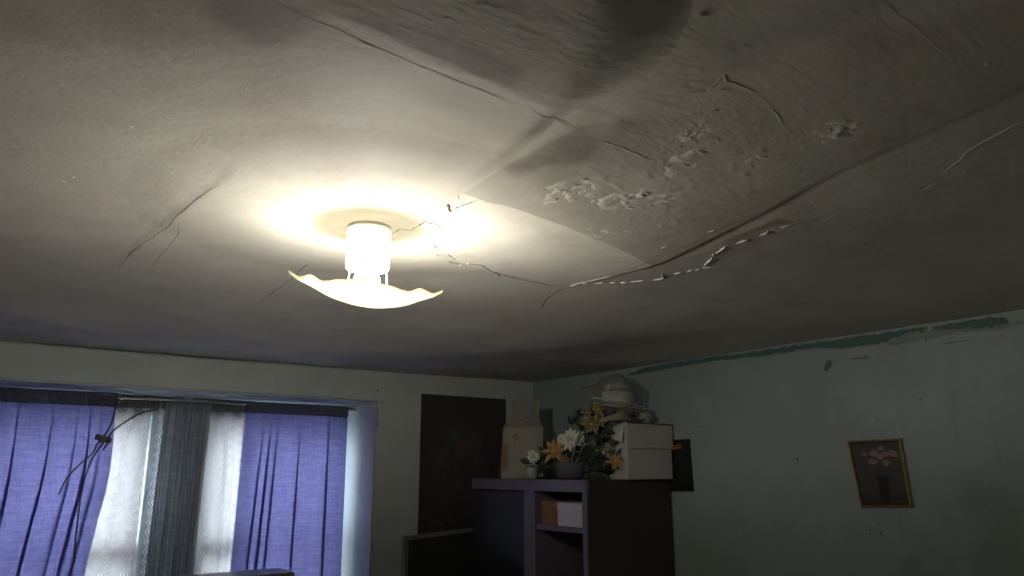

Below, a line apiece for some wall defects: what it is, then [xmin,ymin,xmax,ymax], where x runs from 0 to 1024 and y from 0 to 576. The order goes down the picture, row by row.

crack [274,0,505,101]
crack [120,188,213,267]
crack [392,201,820,309]
peeling [542,179,678,210]